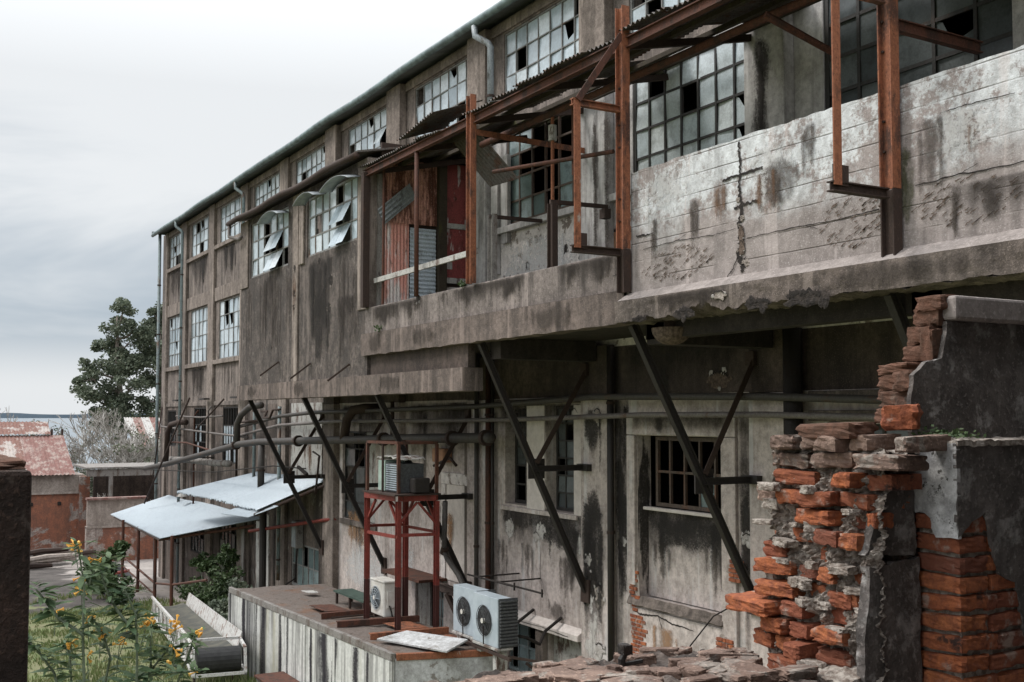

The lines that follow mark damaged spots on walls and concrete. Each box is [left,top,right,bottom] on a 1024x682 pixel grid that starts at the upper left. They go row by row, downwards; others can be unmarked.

leakage [752,41,769,131]
leakage [763,123,814,207]
leakage [917,117,942,191]
crack [636,141,879,277]
leakage [309,258,358,358]
spalling [672,305,695,323]
spalling [711,290,727,301]
spalling [744,287,830,313]
leakage [654,526,670,575]
leakage [705,528,722,591]
flaking render [629,565,648,654]